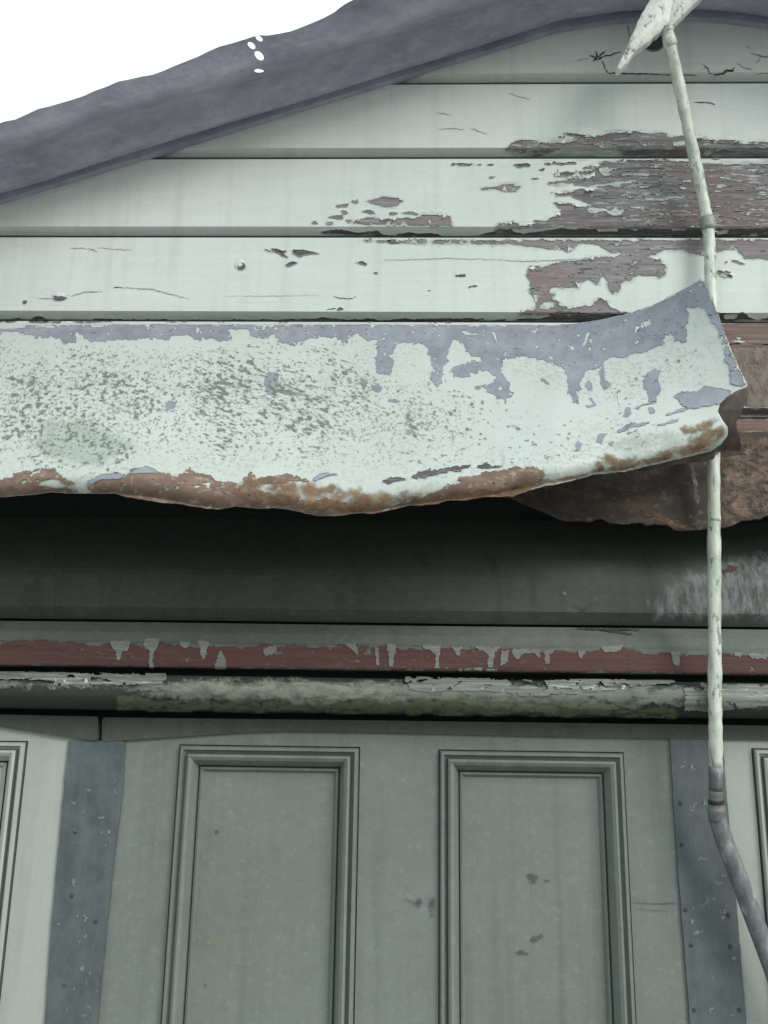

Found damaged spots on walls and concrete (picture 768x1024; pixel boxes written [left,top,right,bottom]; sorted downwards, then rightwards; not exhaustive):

crack [577,46,768,76]
peeling [0,130,768,446]
peeling [87,466,159,485]
rust [0,420,768,531]
peeling [383,462,503,484]
peeling [0,639,708,714]
peeling [722,653,768,711]